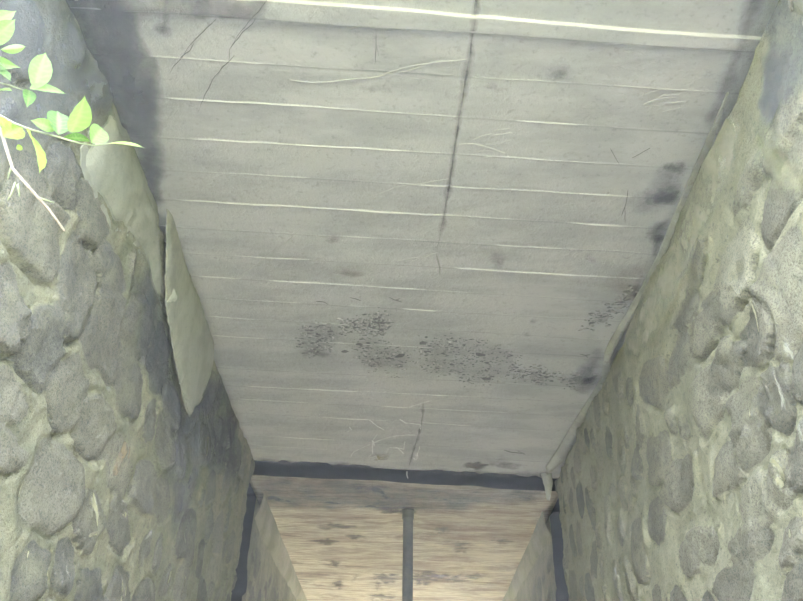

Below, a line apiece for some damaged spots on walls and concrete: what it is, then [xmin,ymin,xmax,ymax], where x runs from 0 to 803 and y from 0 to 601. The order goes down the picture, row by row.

water stain [0,0,154,139]
crack [171,18,217,71]
crack [200,0,267,106]
spalling [296,314,410,367]
spalling [419,335,493,387]